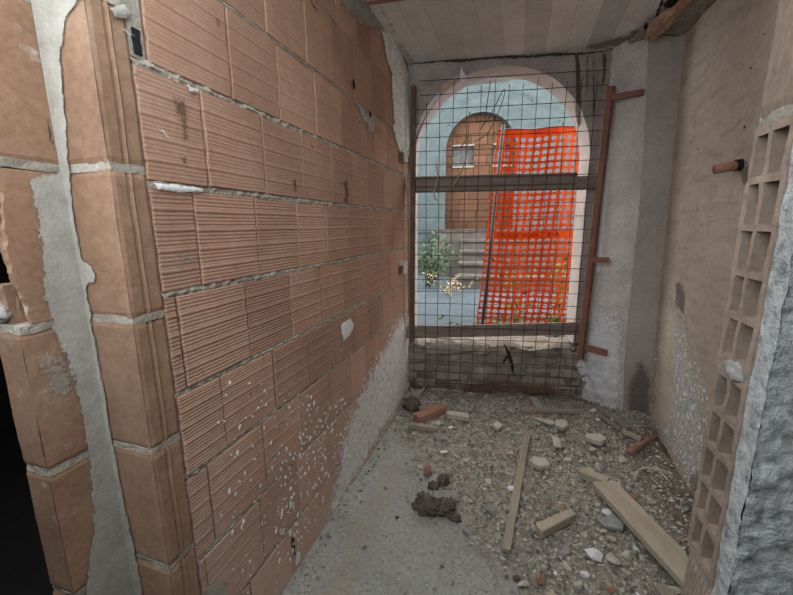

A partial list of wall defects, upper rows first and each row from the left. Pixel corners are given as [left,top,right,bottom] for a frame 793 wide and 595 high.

spalling [643,0,693,42]
crack [655,0,716,37]
damp [582,292,709,497]